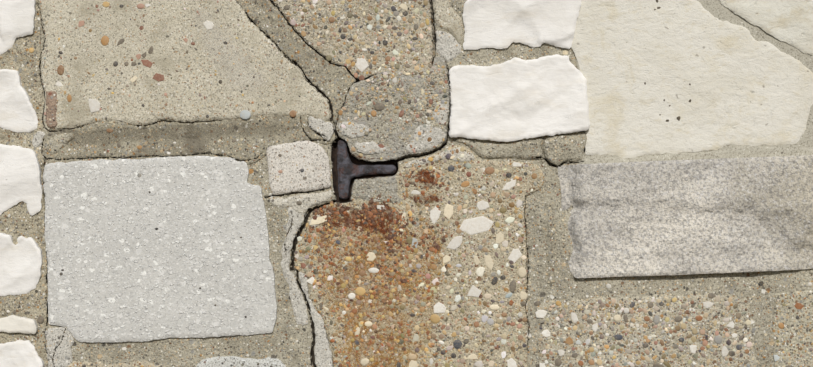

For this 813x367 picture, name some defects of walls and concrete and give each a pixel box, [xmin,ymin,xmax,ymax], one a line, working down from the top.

crack [245,0,373,141]
crack [393,0,451,164]
crack [265,189,335,367]
rust [298,163,453,367]